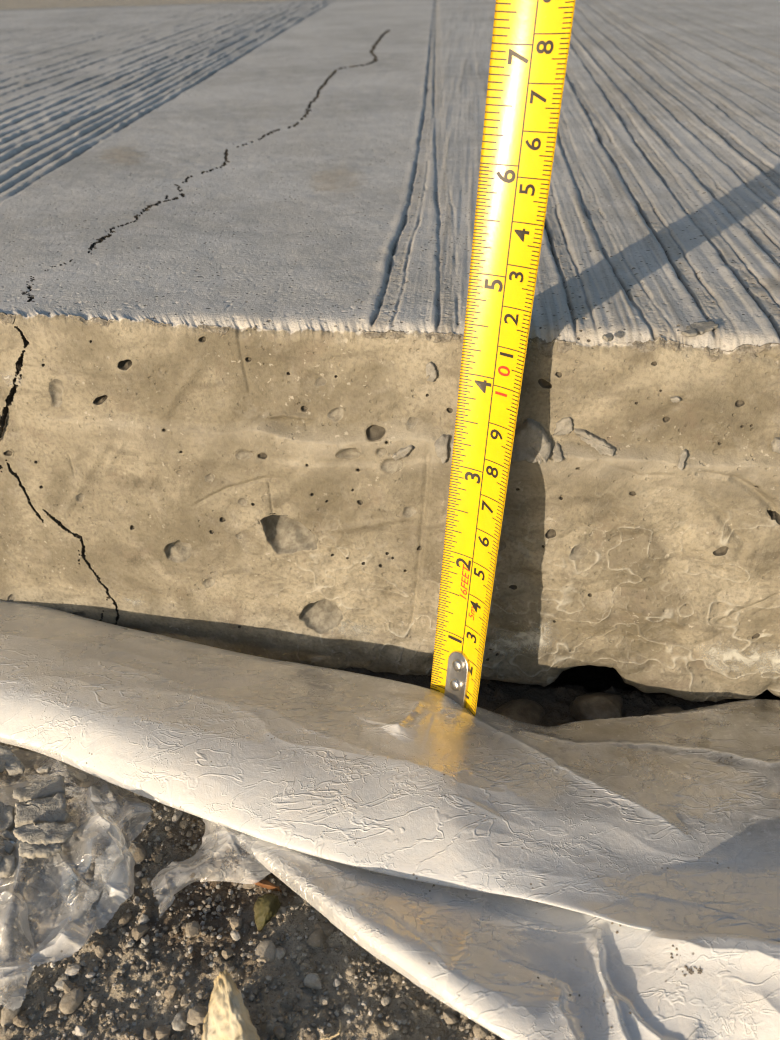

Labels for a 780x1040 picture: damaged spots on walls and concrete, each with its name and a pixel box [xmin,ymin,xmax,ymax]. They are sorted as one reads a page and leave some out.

crack [22,31,389,302]
crack [0,326,120,625]